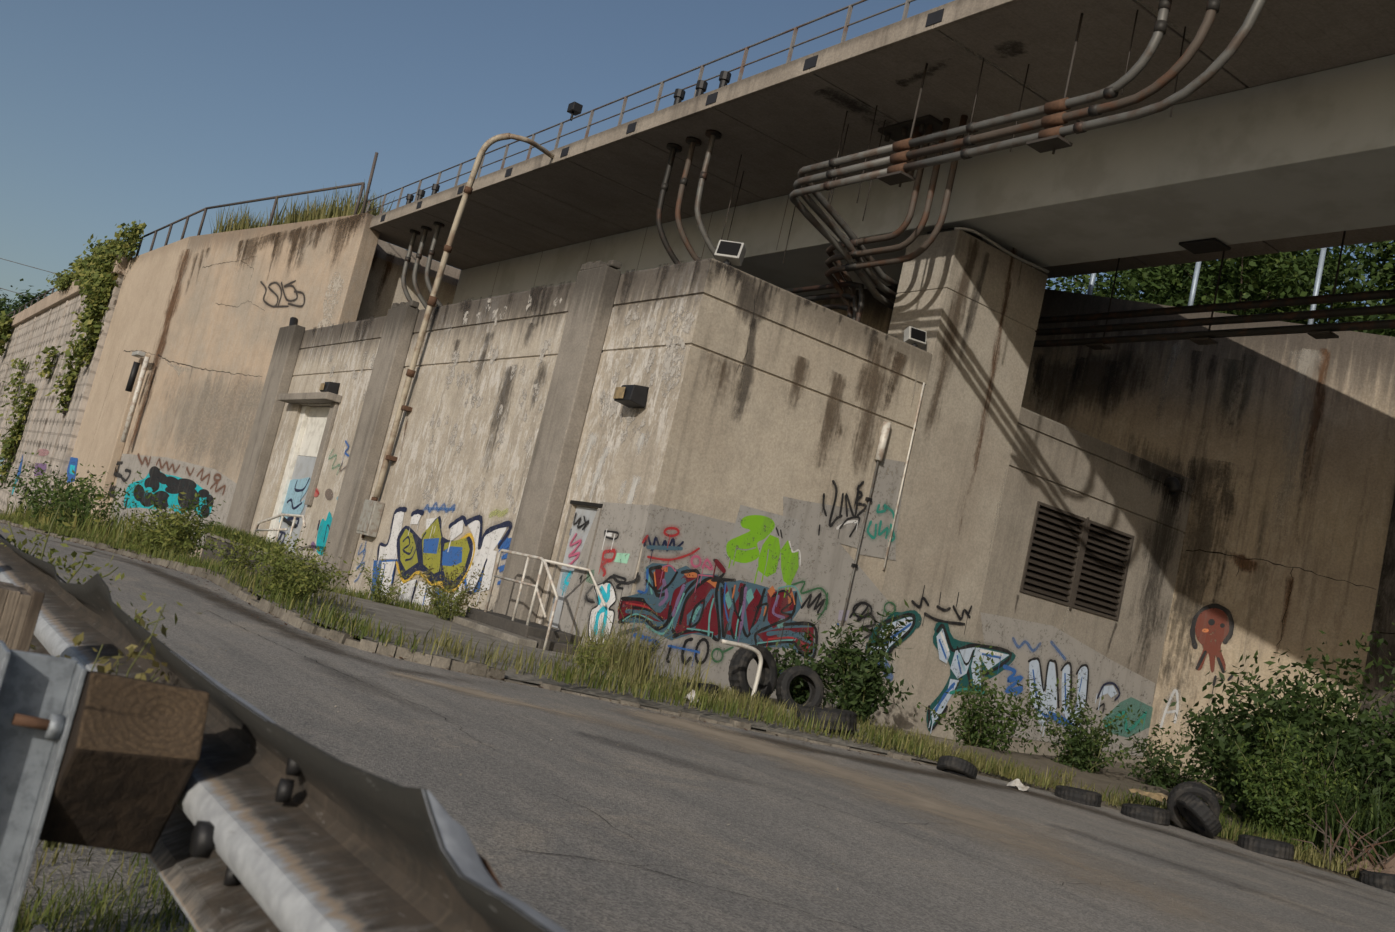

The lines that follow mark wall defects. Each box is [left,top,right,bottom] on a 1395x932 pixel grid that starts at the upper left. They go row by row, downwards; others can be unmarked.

damp [238,213,366,264]
crack [91,350,262,445]
damp [657,257,780,412]
damp [793,356,806,395]
damp [822,327,906,459]
damp [927,239,989,422]
corrosion [1305,349,1330,475]
corrosion [1233,555,1257,572]